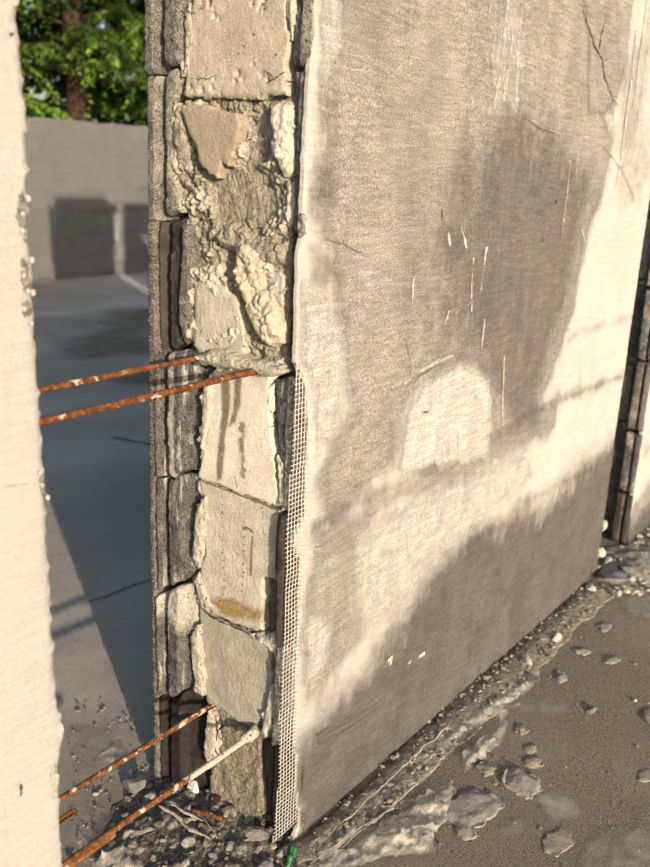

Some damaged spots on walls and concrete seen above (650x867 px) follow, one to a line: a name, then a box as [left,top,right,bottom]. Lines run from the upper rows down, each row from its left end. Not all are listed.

crack [581,3,620,107]
peeling [181,104,249,179]
spalling [39,369,259,427]
damp [297,0,650,835]